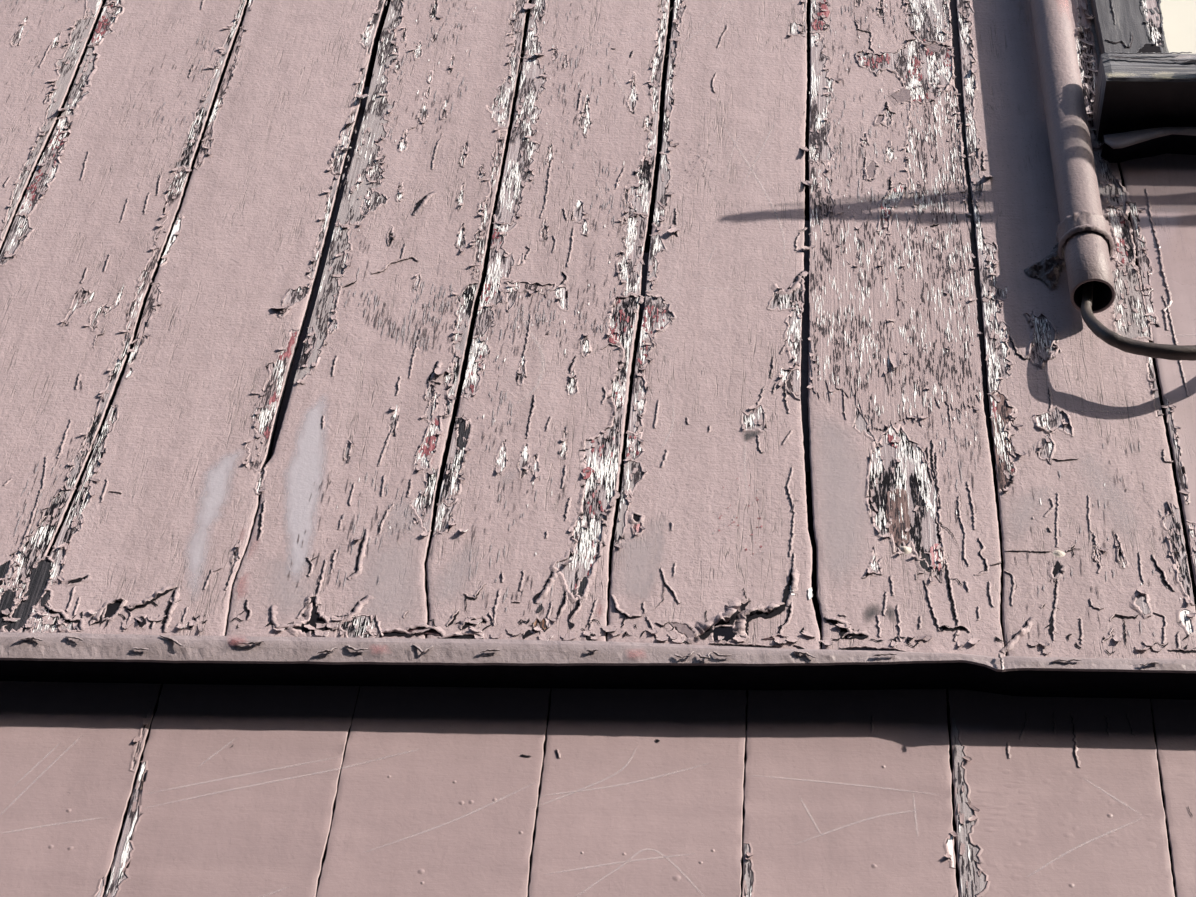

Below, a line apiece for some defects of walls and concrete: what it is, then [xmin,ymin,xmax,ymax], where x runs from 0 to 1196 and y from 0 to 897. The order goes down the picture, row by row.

peeling [0,0,255,633]
crack [119,0,215,222]
peeling [242,0,455,495]
crack [328,0,643,450]
peeling [407,0,570,537]
crack [3,285,1196,669]
peeling [549,0,688,606]
crack [711,24,729,93]
peeling [766,0,1074,583]
peeling [1074,0,1160,341]
crack [1103,0,1196,63]
crack [1142,189,1190,397]